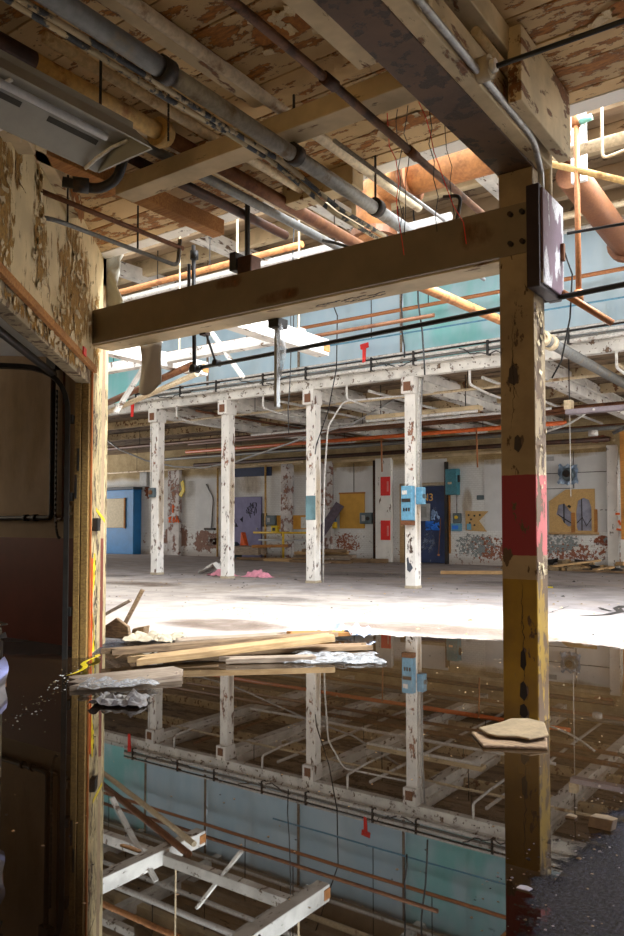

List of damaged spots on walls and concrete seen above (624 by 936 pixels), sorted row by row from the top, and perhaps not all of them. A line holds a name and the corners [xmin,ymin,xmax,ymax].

peeling [247,5,319,56]
peeling [588,0,624,29]
peeling [0,136,101,378]
peeling [536,308,547,375]
peeling [506,363,519,386]
spalling [181,524,228,561]
peeling [451,533,502,563]
peeling [538,534,608,575]
crack [550,606,624,616]
spalling [520,681,530,718]